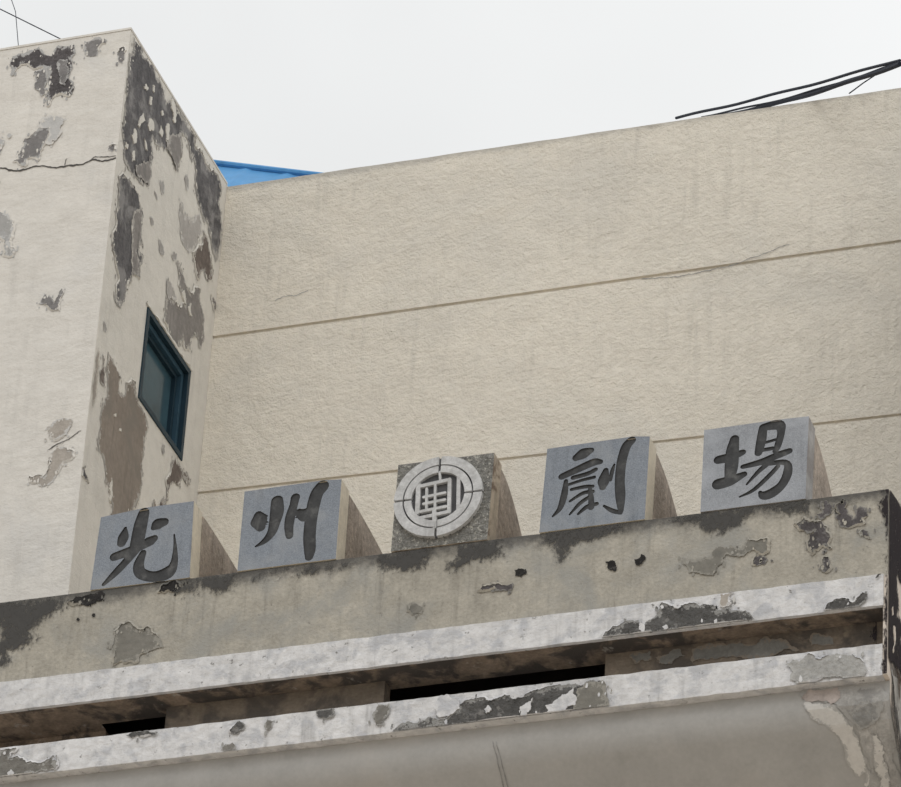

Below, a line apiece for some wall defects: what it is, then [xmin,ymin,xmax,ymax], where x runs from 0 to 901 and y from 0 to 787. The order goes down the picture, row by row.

peeling [6,36,107,170]
crack [0,155,116,172]
peeling [108,38,222,352]
peeling [36,288,65,311]
peeling [27,418,78,488]
peeling [96,352,149,515]
peeling [678,537,773,576]
peeling [793,498,876,573]
peeling [107,621,164,668]
spalling [602,592,753,637]
peeling [368,678,612,732]
spalling [629,633,901,787]